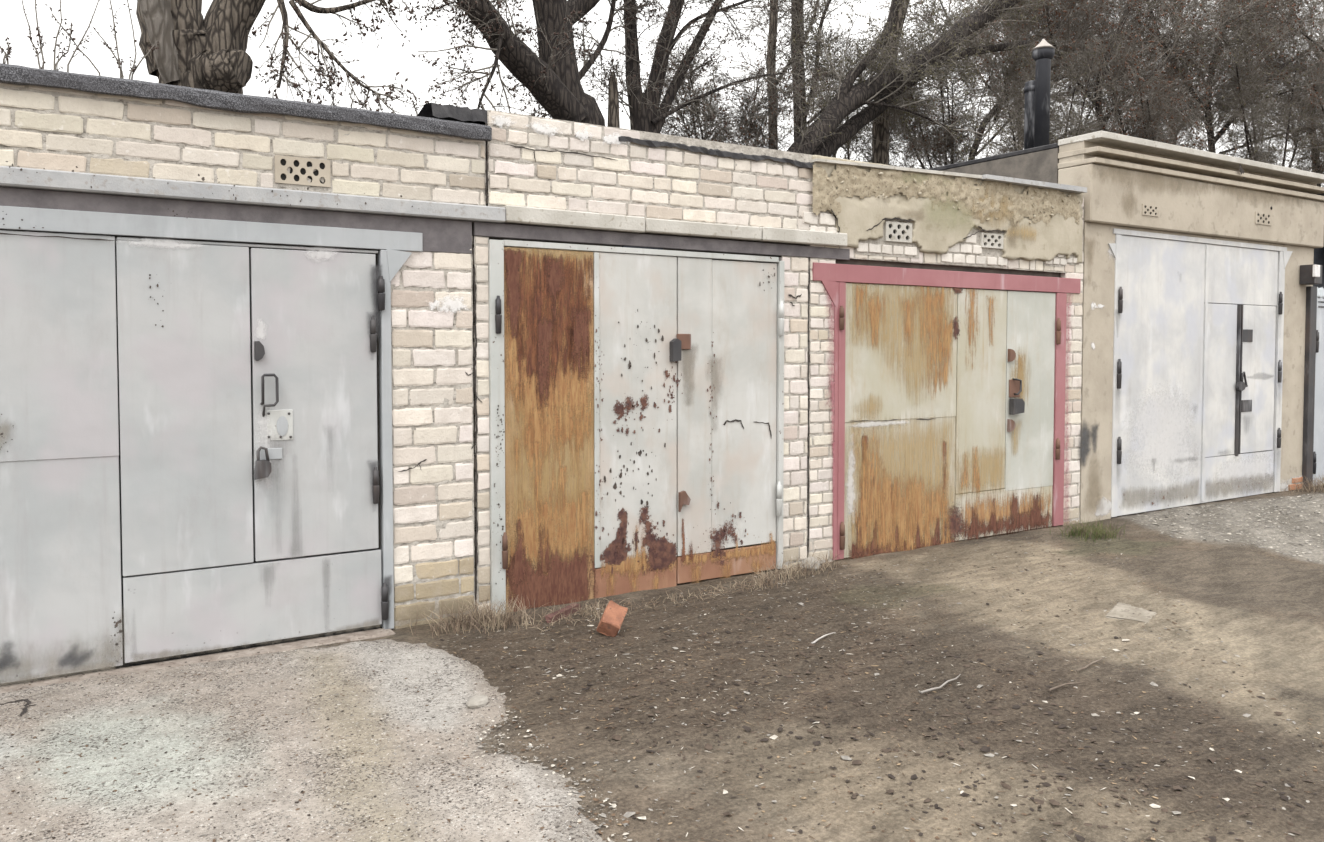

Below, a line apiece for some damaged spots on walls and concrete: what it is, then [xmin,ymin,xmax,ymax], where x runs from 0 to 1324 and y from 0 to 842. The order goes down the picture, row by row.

spalling [802,160,1081,268]
corrosion [856,283,886,346]
corrosion [902,286,995,392]
corrosion [504,249,775,623]
corrosion [849,425,1053,559]